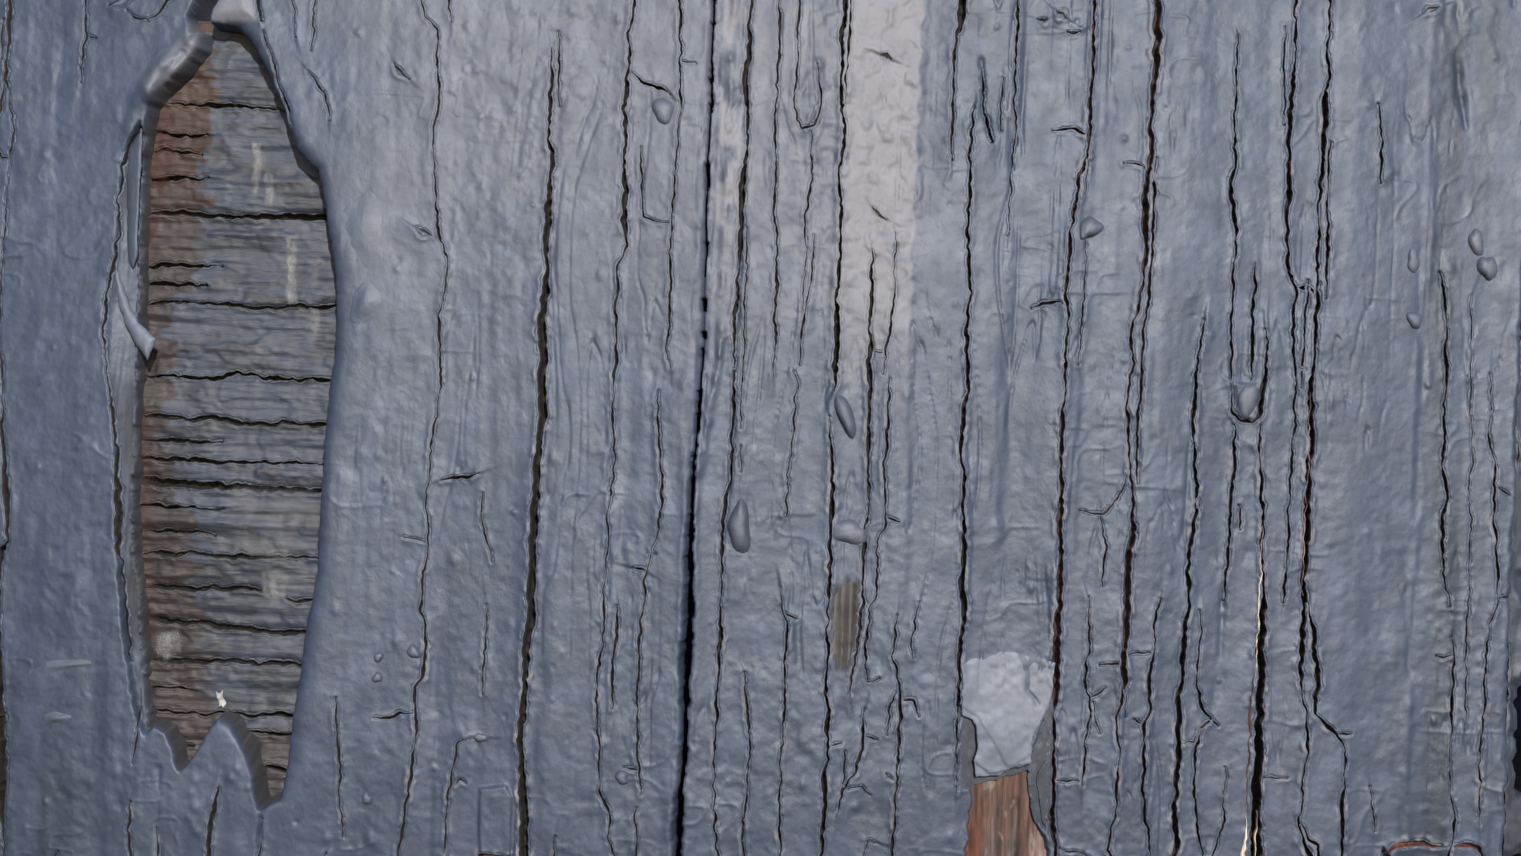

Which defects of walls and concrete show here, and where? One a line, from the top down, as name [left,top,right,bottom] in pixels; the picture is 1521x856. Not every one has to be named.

crack [79,0,96,83]
peeling [115,130,156,360]
crack [0,0,16,856]
crack [100,0,337,775]
crack [323,0,562,856]
crack [593,0,696,856]
crack [711,0,1521,856]
crack [125,801,161,856]
crack [205,787,221,856]
crack [256,818,264,856]
peeling [956,652,1055,856]